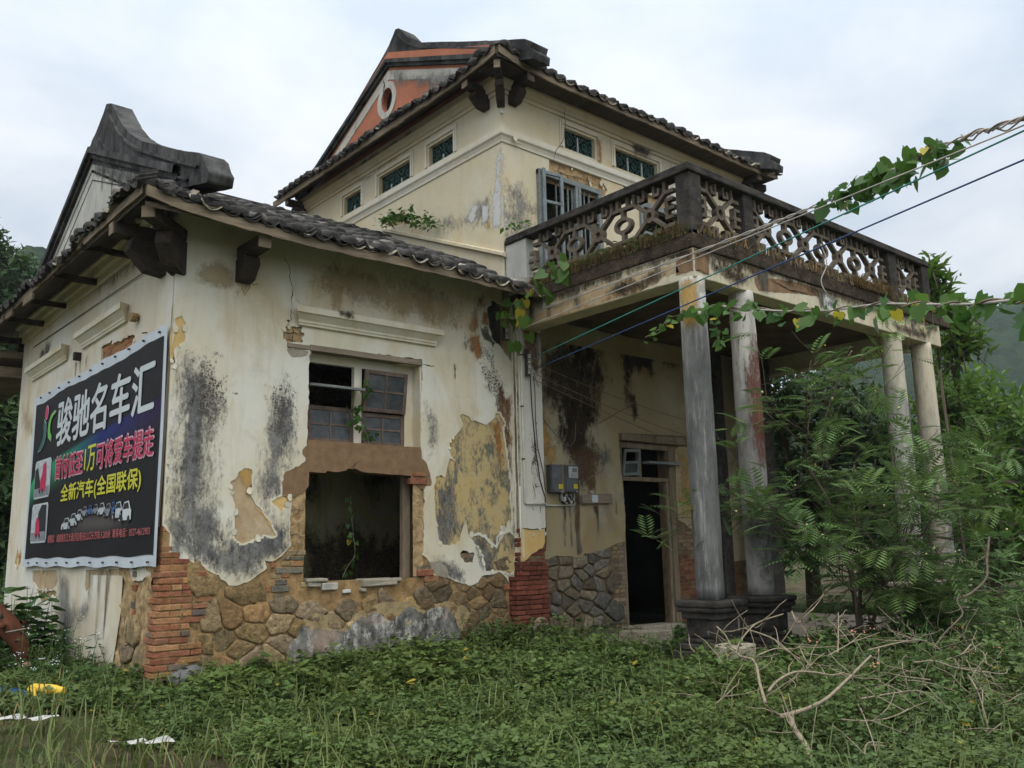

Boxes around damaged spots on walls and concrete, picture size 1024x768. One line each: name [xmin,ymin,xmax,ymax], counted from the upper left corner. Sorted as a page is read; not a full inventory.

flaking render [103,334,135,359]
flaking render [170,316,188,369]
damp [167,352,286,576]
damp [258,385,298,499]
crack [271,254,298,341]
flaking render [281,323,310,350]
damp [464,337,519,529]
flaking render [527,248,709,326]
damp [510,249,877,464]
corrosion [745,337,767,465]
damp [885,315,937,339]
flaking render [85,413,627,687]